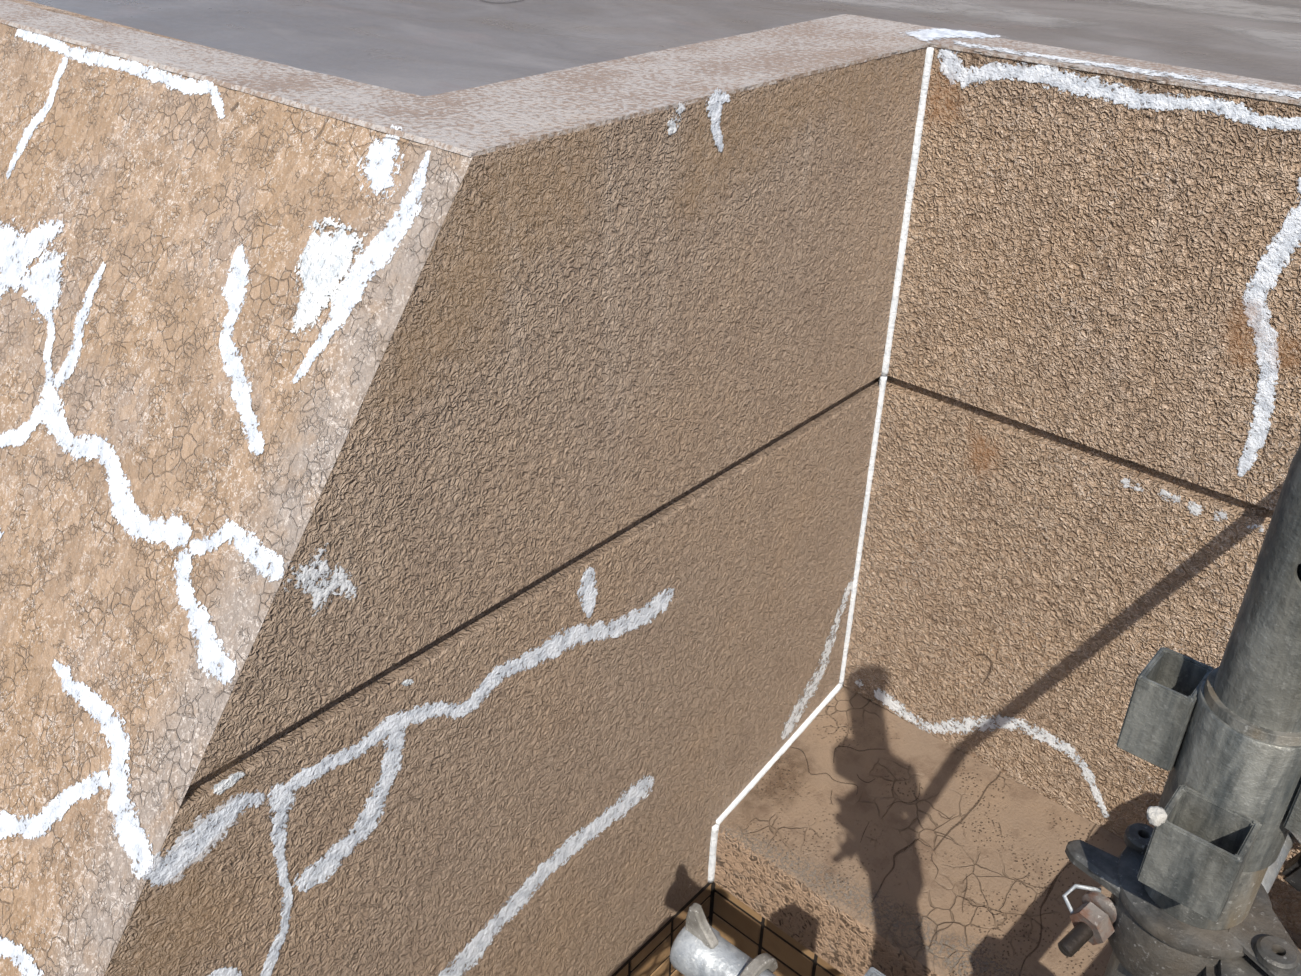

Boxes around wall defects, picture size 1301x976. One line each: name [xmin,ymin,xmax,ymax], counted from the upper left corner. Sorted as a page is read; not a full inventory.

crack [6,28,238,179]
crack [938,49,1301,131]
crack [0,218,284,685]
crack [292,137,431,384]
crack [1236,177,1301,477]
crack [0,588,674,976]
crack [781,574,1002,949]
crack [854,679,1110,976]